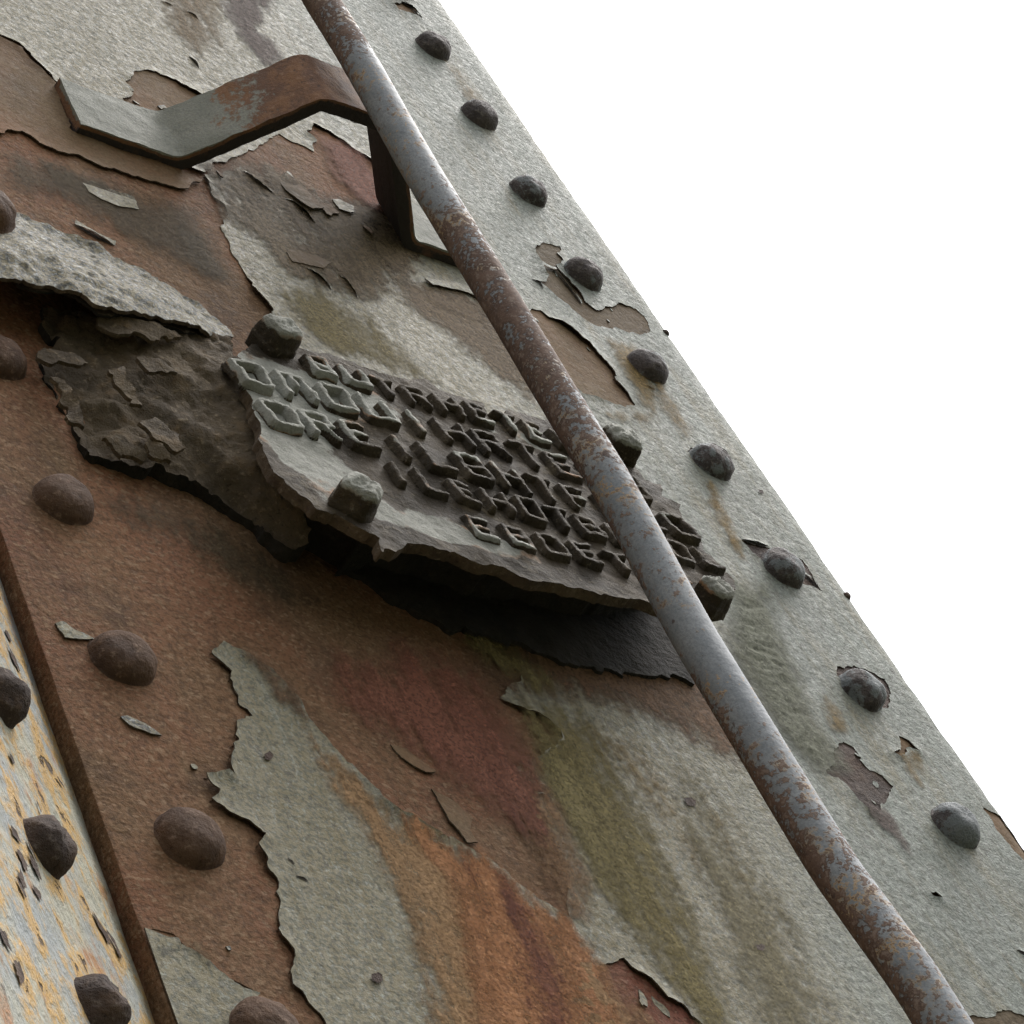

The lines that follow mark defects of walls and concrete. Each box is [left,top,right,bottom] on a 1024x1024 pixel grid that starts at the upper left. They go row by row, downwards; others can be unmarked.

peeling [535,243,650,335]
peeling [0,36,568,1024]
corrosion [495,644,737,754]
peeling [826,743,892,808]
corrosion [311,736,655,1024]
peeling [598,960,698,1024]